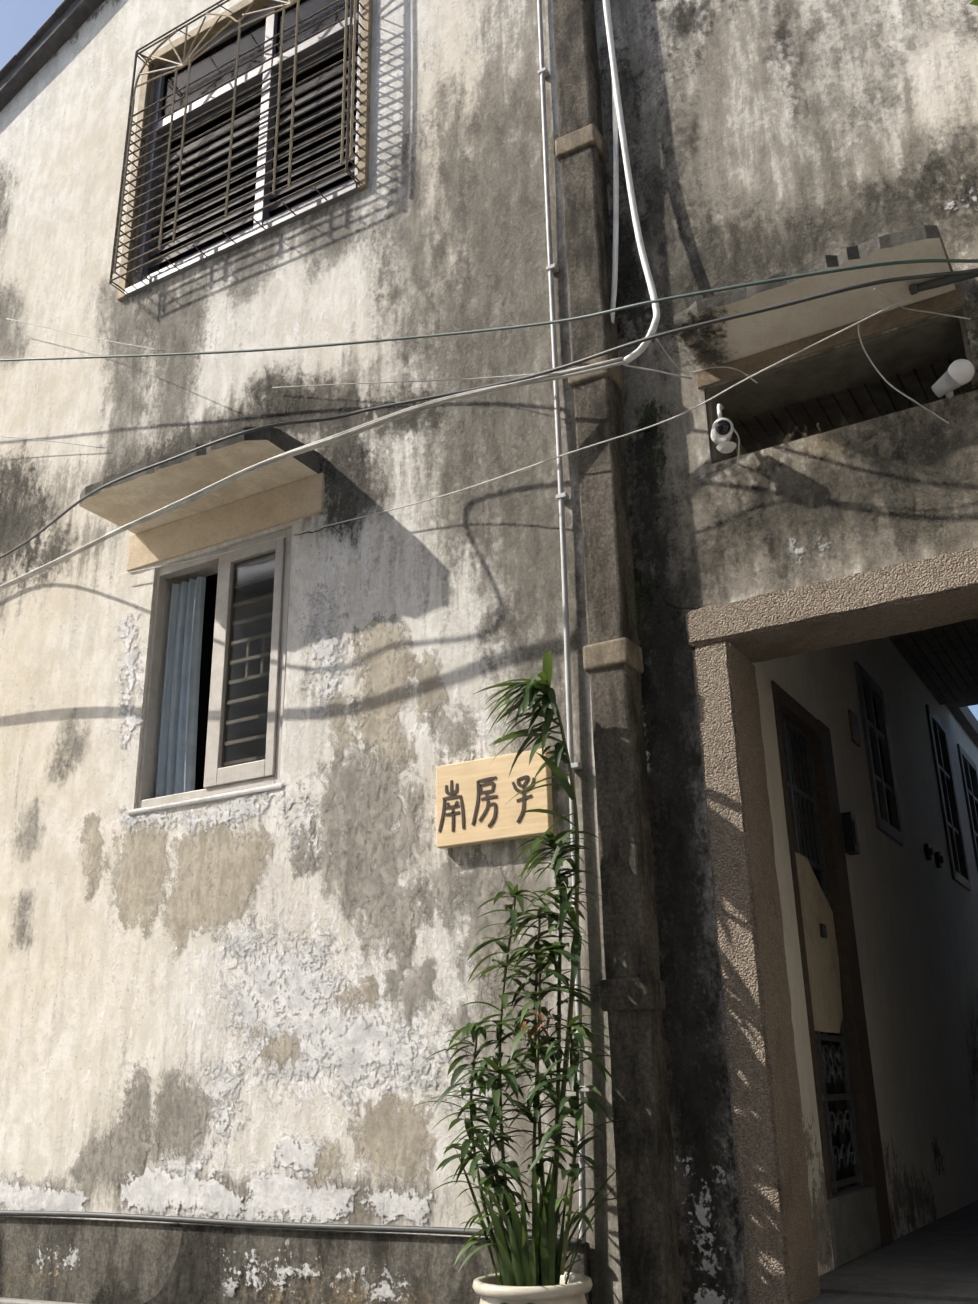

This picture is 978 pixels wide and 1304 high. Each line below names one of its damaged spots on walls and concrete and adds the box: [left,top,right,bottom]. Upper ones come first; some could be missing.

water stain [0,167,16,233]
water stain [598,0,978,375]
water stain [0,285,28,363]
water stain [0,442,78,588]
water stain [98,86,581,790]
water stain [626,286,978,1304]
peeling [0,585,552,1226]
peeling [37,1246,80,1279]
peeling [218,1240,411,1304]
peeling [674,1148,733,1304]